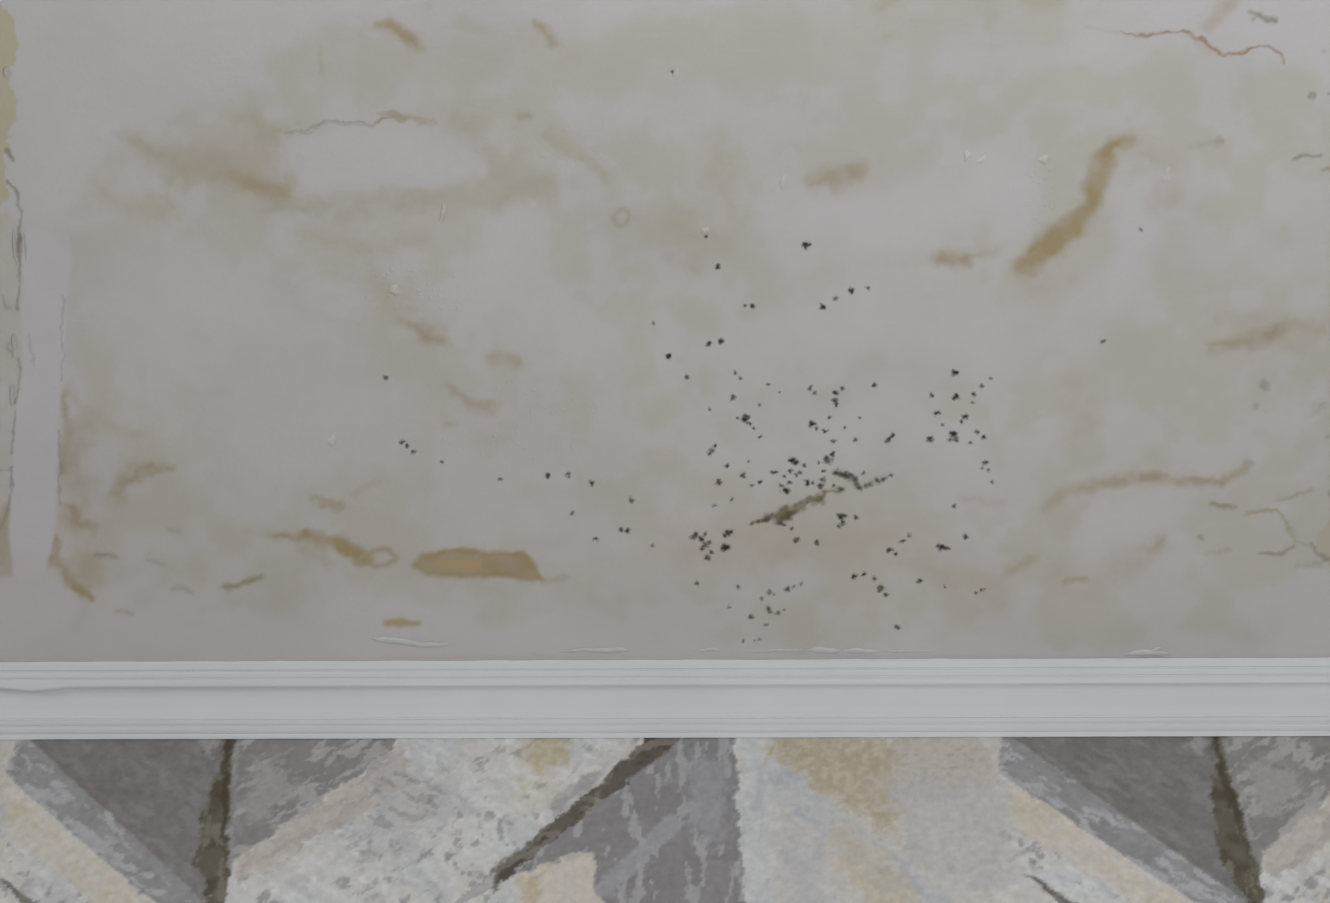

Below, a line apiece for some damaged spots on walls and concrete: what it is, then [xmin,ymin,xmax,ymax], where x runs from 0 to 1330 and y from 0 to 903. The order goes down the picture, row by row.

peeling [1246,8,1280,26]
crack [1082,23,1286,67]
peeling [0,2,21,236]
crack [283,108,440,136]
damp [0,0,1330,657]